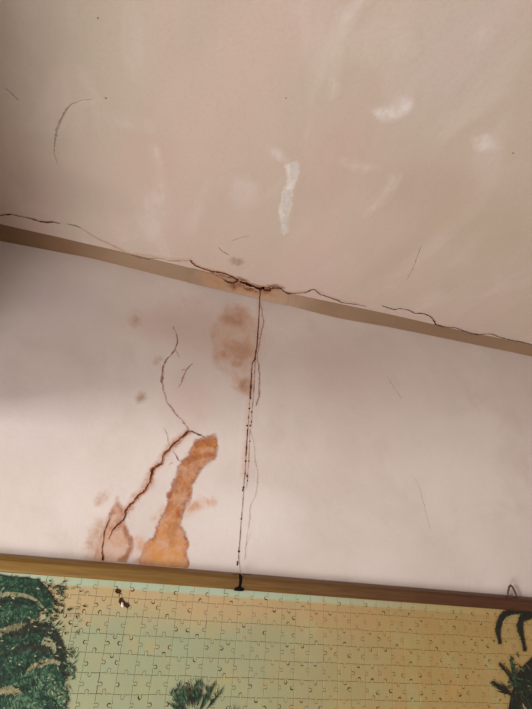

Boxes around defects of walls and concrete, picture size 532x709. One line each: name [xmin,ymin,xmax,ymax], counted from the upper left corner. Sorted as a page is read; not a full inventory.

peeling [261,142,308,237]
crack [0,214,366,572]
water stain [188,253,290,403]
crack [383,306,532,345]
corrosion [133,427,226,569]